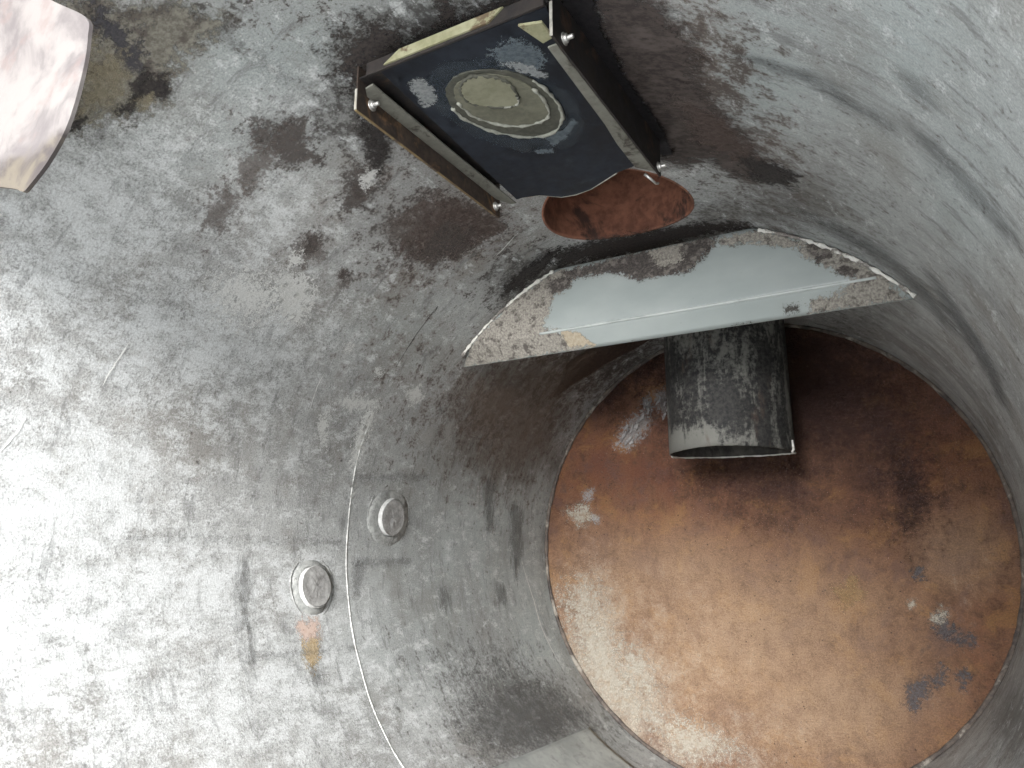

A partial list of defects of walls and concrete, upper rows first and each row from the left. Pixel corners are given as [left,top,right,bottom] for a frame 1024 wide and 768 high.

peeling [546,276,572,295]
peeling [561,331,596,348]
rust [559,339,650,393]
rust [296,616,321,677]